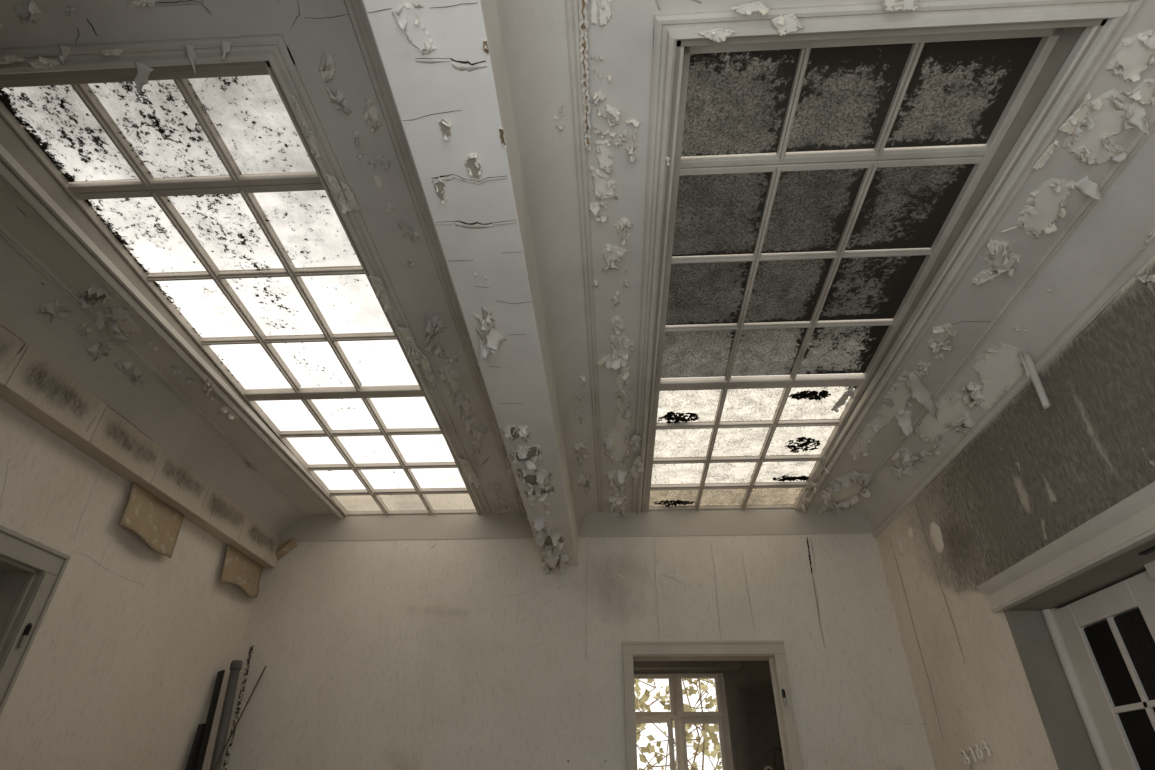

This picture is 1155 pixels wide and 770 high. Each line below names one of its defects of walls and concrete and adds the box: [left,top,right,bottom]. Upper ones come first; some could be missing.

crack [415,58,487,72]
crack [432,174,507,184]
spalling [464,152,483,180]
peeling [586,55,641,307]
peeling [971,30,1155,286]
crack [447,220,515,229]
spalling [369,276,392,312]
peeling [466,306,507,374]
peeling [597,332,644,517]
spalling [795,323,1051,516]
spalling [457,458,481,488]
peeling [500,425,572,575]